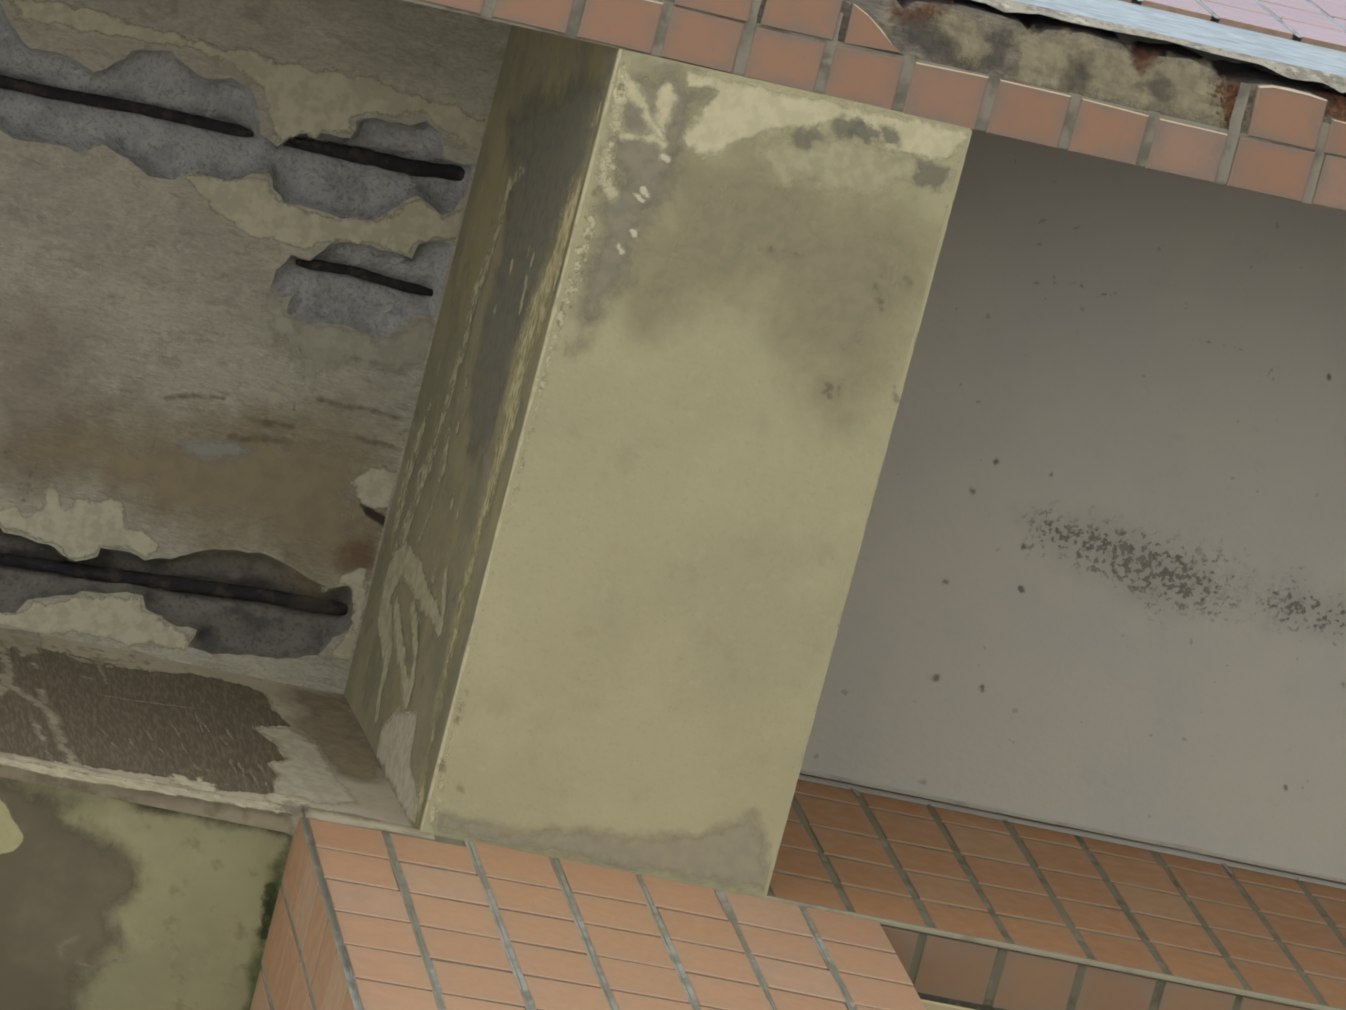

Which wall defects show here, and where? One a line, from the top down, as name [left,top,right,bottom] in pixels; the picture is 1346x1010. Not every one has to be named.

peeling [838,0,1346,134]
spalling [0,0,486,340]
damp [583,70,711,322]
damp [794,119,899,148]
damp [913,160,949,187]
spalling [0,481,367,661]
damp [1041,521,1230,608]
damp [1268,580,1345,634]
peeling [0,800,24,854]
damp [139,804,177,813]
peeling [0,728,356,815]
damp [0,779,137,1010]